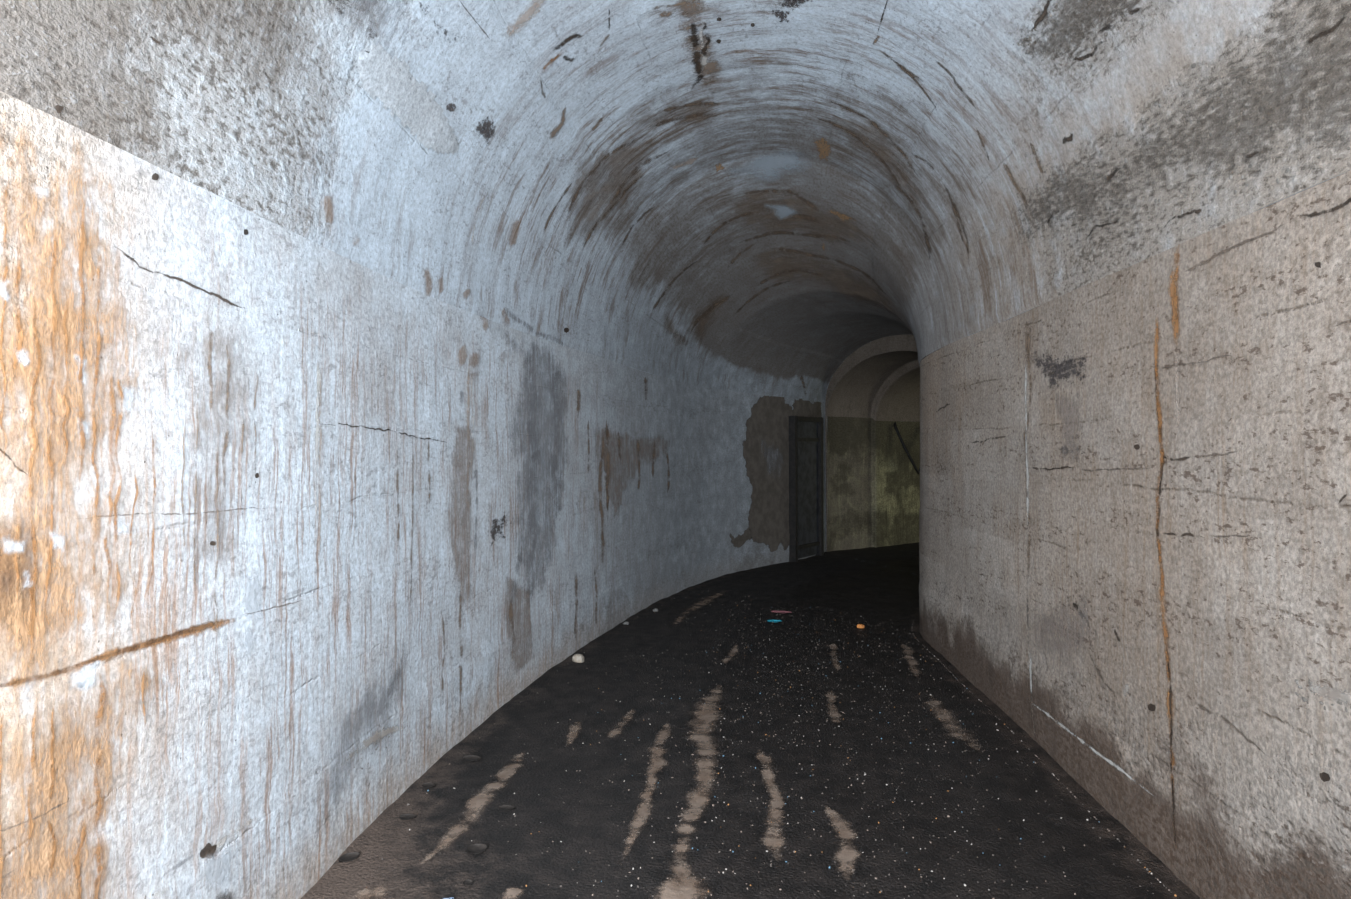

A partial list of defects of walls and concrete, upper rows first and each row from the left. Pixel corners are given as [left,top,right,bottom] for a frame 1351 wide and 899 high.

crack [654,0,755,87]
crack [120,248,241,308]
rust [0,132,156,687]
crack [0,601,299,686]
leakage [442,311,670,668]
peeling [730,396,822,552]
crack [973,322,1246,841]
rust [0,664,149,899]